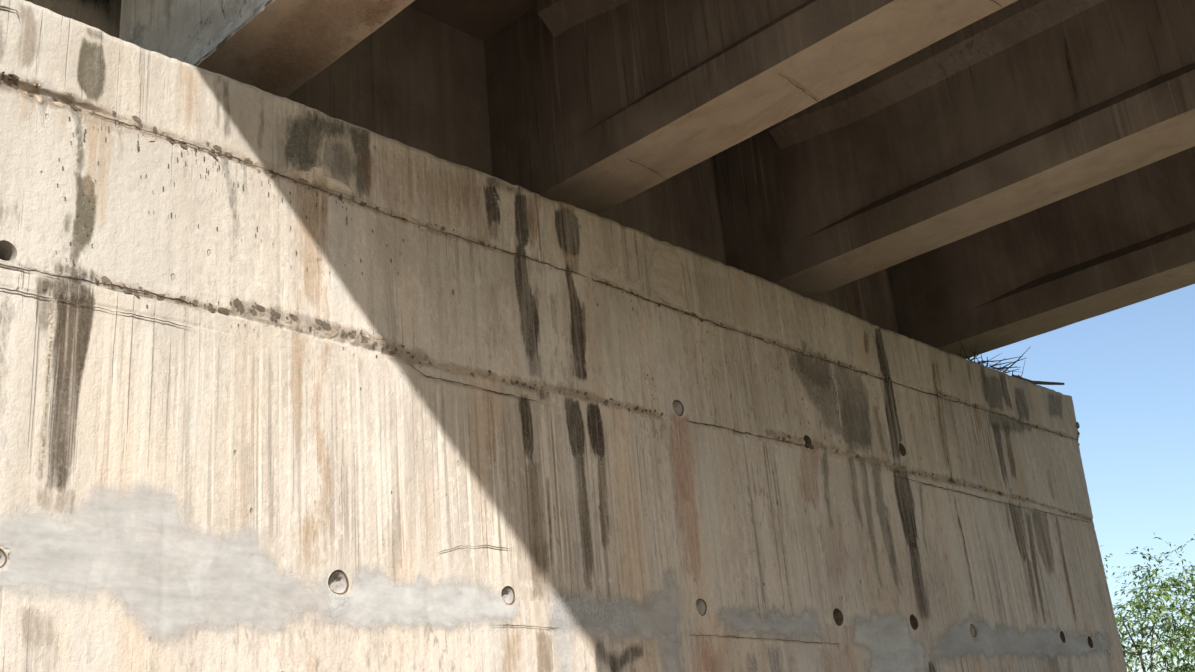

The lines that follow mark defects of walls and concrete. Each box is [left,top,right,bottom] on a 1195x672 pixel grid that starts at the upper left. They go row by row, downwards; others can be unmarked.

water stain [78,39,105,99]
water stain [286,111,371,193]
water stain [39,136,95,488]
water stain [555,209,587,379]
water stain [519,395,543,459]
water stain [875,328,902,446]
water stain [566,399,605,580]
water stain [893,466,928,618]
water stain [596,646,643,672]